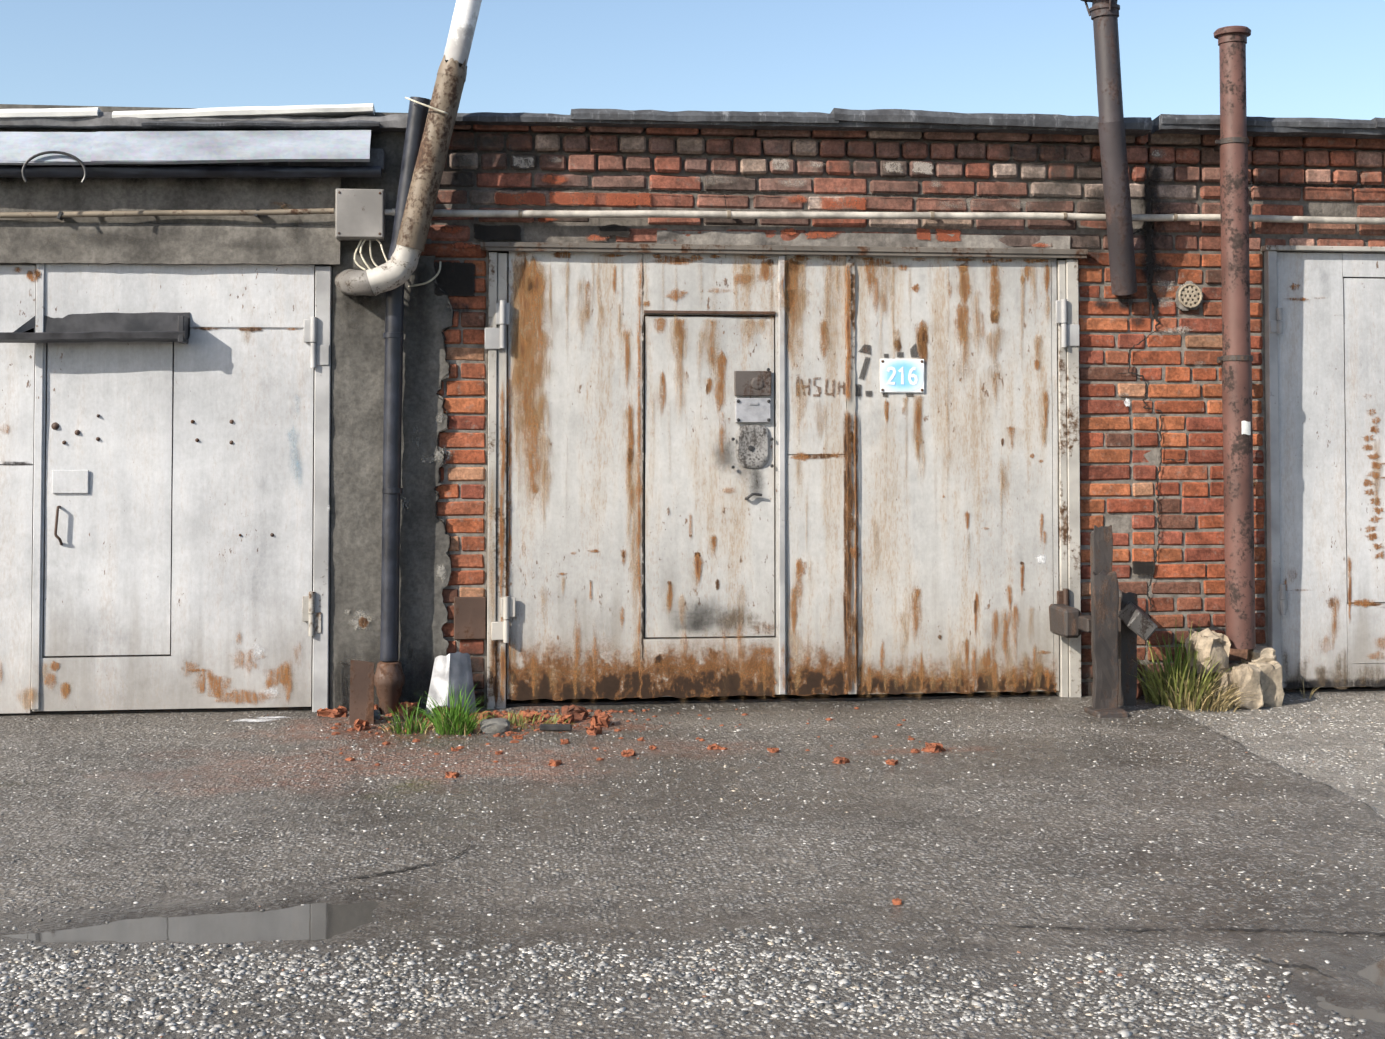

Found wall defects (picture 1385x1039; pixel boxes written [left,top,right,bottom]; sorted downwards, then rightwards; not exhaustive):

peeling [421,448,450,463]
rust [490,253,1057,705]
rust [1364,409,1385,559]
rust [1324,558,1381,642]
rust [186,637,291,703]